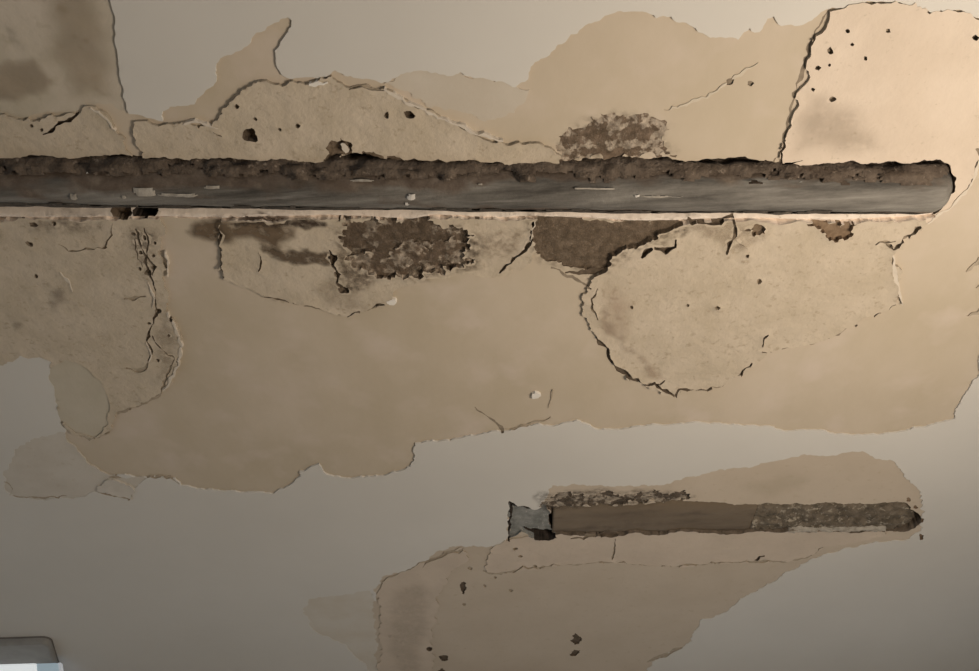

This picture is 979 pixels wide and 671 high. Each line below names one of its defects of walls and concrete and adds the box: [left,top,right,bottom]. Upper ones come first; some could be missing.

crack [773,10,830,163]
crack [58,223,184,415]
corrosion [0,153,950,186]
peeling [0,0,979,501]
crack [499,220,536,274]
crack [551,267,786,398]
crack [641,213,744,259]
peeling [372,451,925,671]